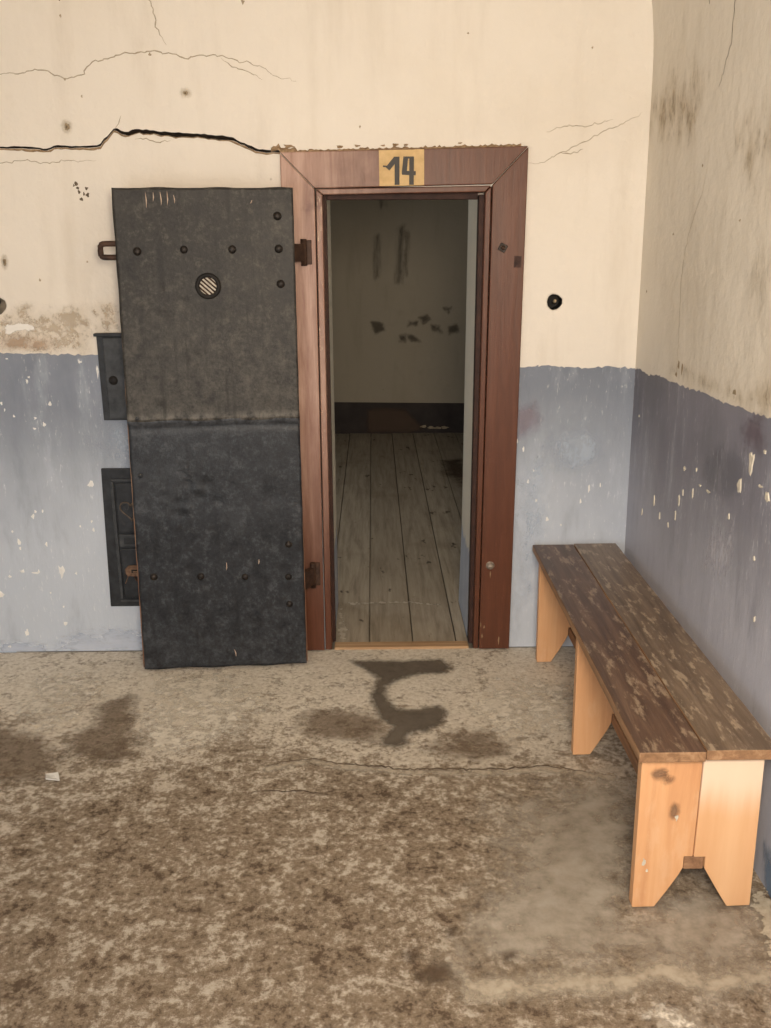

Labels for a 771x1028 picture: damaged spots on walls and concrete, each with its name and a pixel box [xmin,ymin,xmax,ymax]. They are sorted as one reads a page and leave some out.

crack [0,0,292,81]
crack [0,116,280,164]
crack [533,116,639,164]
flaking render [0,291,87,359]
damp [0,730,54,784]
damp [72,698,133,762]
damp [305,660,451,746]